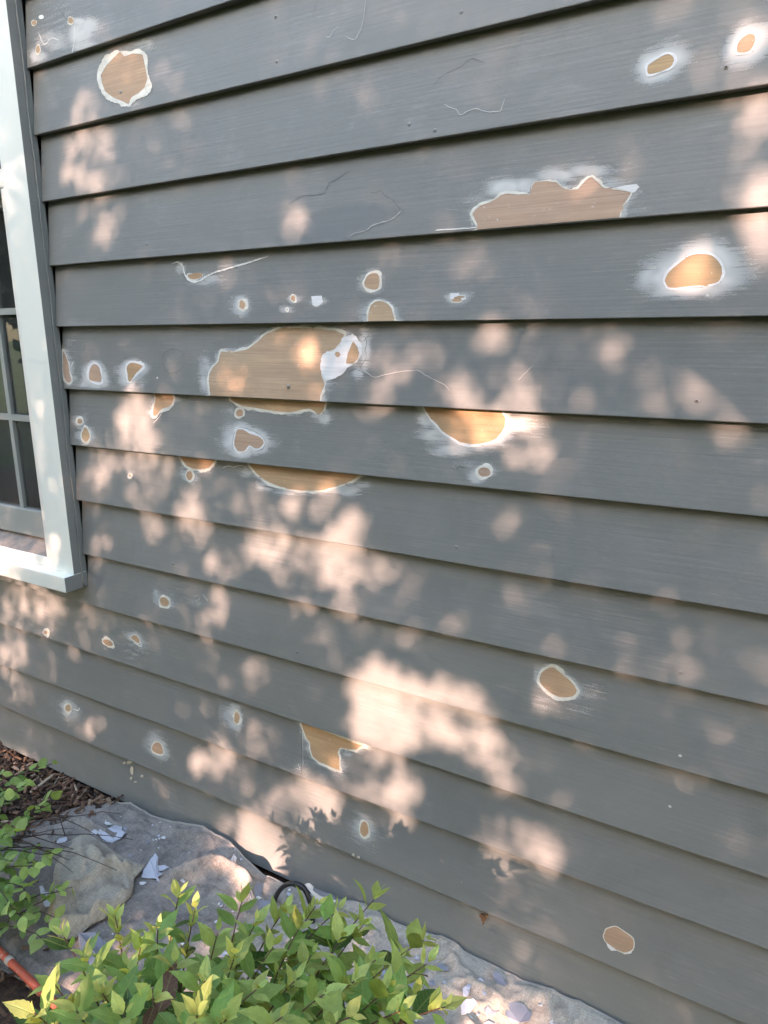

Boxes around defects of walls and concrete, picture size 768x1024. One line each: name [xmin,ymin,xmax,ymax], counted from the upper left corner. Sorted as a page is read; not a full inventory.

peeling [97,39,153,107]
crack [433,58,505,115]
peeling [636,42,690,85]
peeling [722,23,768,67]
peeling [436,164,639,231]
peeling [637,239,749,298]
peeling [62,347,184,422]
peeling [176,270,402,496]
peeling [415,406,529,484]
peeling [533,664,583,701]
peeling [298,722,372,773]
peeling [603,926,635,954]